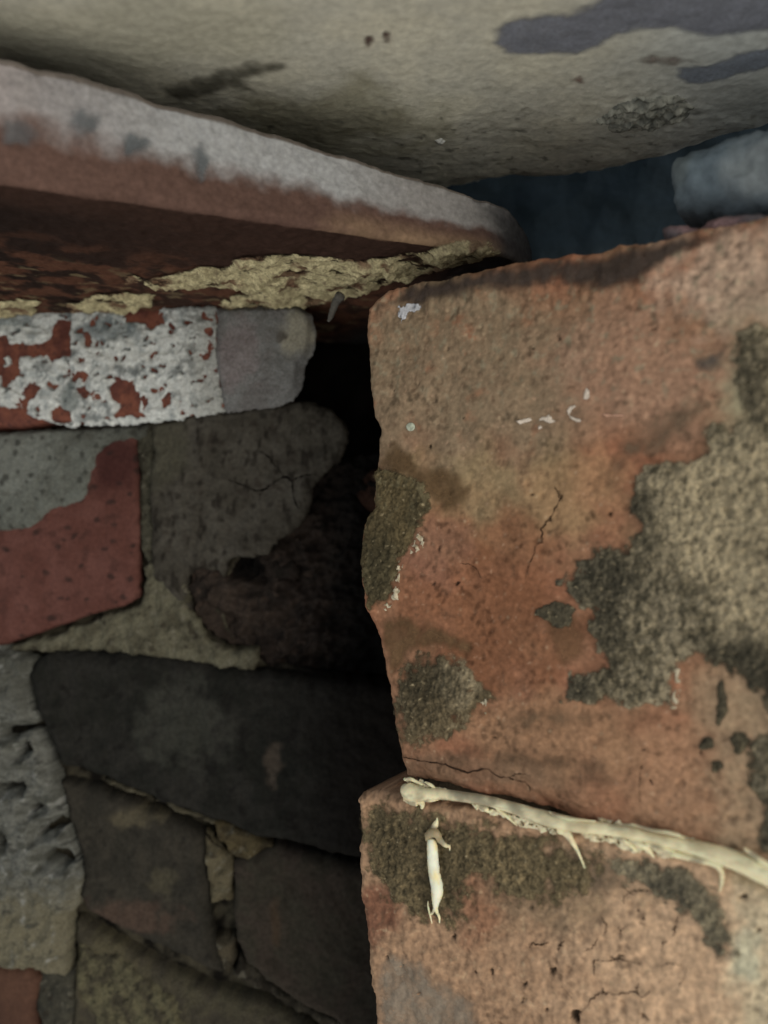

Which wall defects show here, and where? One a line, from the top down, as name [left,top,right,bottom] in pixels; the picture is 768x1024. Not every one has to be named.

water stain [496,0,768,54]
water stain [647,49,768,83]
spalling [596,95,694,133]
peeling [0,275,226,428]
crack [528,488,563,567]
water stain [670,669,680,709]
crack [403,757,531,792]